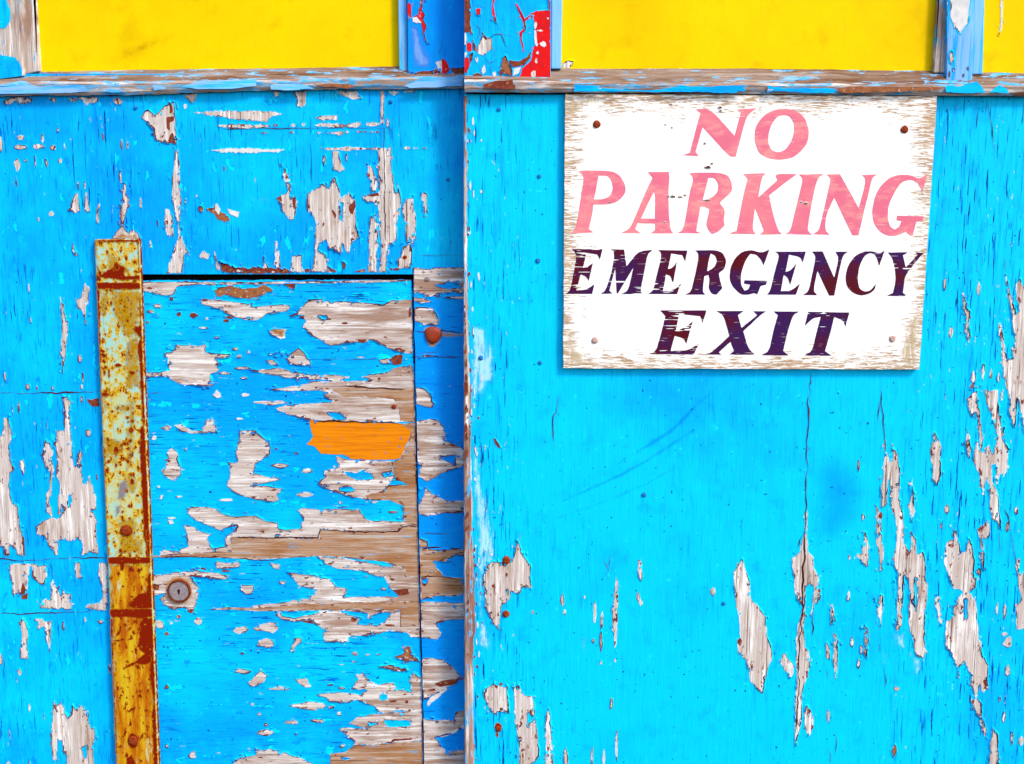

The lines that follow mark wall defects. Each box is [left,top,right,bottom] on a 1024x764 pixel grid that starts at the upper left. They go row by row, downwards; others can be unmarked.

peeling [407,0,550,89]
peeling [2,88,125,107]
peeling [0,127,66,187]
peeling [37,180,101,225]
peeling [112,169,152,249]
peeling [140,81,533,764]
peeling [0,282,110,682]
rust [95,239,158,764]
crack [796,382,814,728]
peeling [732,272,1024,764]
peeling [28,699,99,764]
peeling [476,681,569,764]